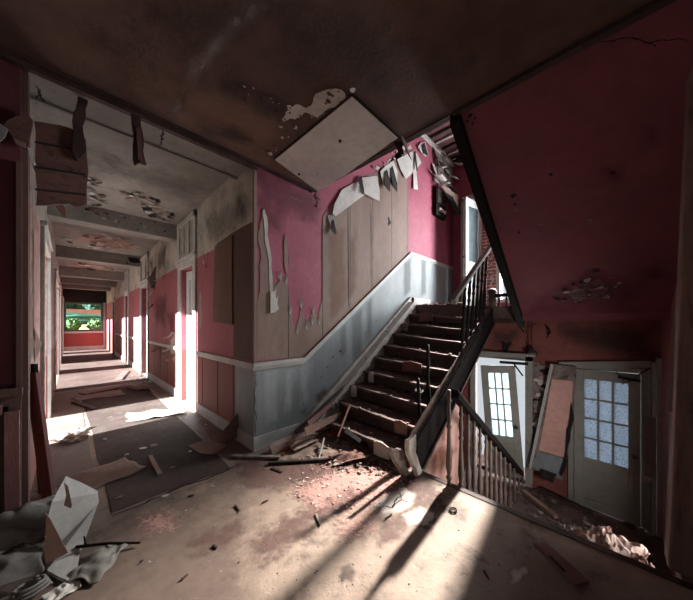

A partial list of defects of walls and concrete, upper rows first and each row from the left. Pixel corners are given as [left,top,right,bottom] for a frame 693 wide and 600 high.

peeling [259,88,355,156]
peeling [85,173,132,223]
peeling [118,192,175,232]
peeling [429,143,465,214]
peeling [60,234,140,273]
spalling [532,361,550,439]